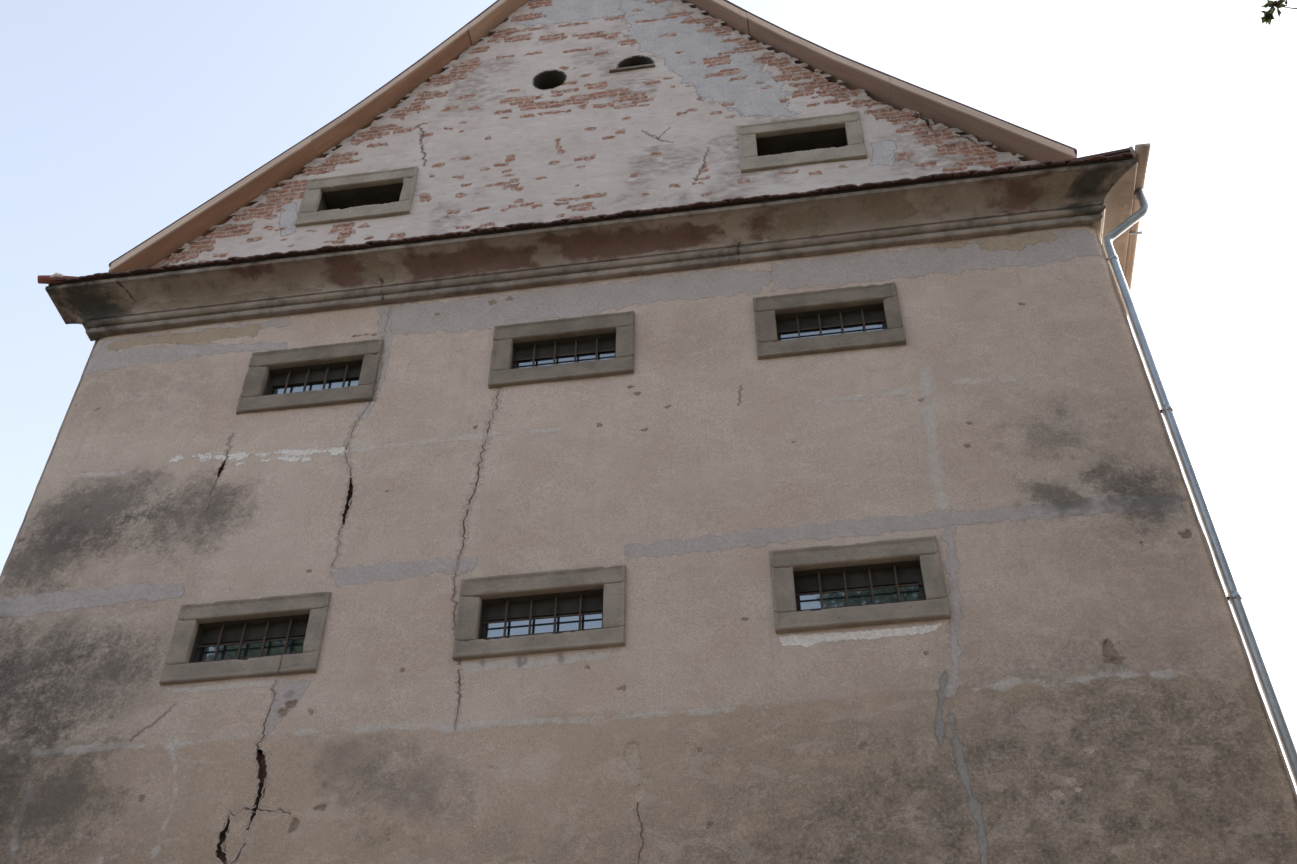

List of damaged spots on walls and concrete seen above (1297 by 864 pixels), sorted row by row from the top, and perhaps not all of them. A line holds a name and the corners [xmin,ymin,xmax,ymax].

flaking render [151,0,1026,268]
crack [205,433,235,513]
crack [330,278,393,569]
crack [212,680,291,864]
spalling [277,700,313,717]